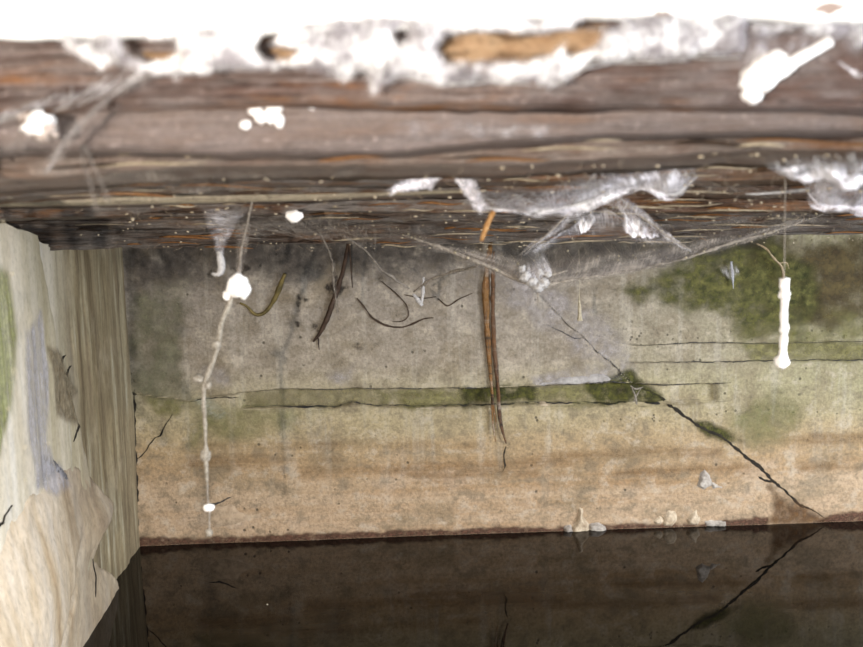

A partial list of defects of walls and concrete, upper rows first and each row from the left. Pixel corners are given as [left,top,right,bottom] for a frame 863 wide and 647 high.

leakage [505,234,863,330]
leakage [248,388,464,409]
leakage [532,370,662,406]
crack [547,302,824,518]
crack [0,505,13,527]
leakage [140,508,768,546]
leakage [817,512,863,522]